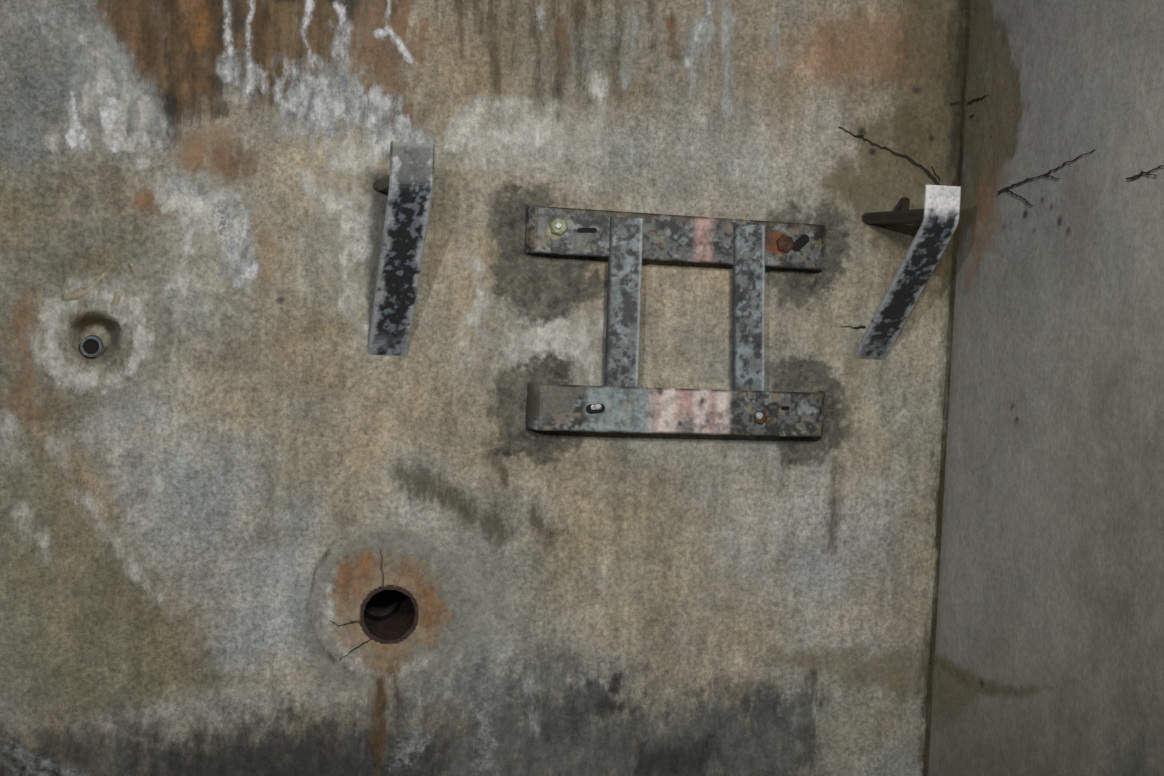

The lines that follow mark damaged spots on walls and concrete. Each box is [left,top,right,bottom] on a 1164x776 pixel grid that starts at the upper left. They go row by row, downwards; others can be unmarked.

leakage [217,0,569,176]
leakage [589,71,607,159]
crack [839,0,990,187]
crack [997,149,1096,206]
leakage [299,170,377,315]
leakage [466,258,490,332]
leakage [506,307,606,381]
crack [950,226,958,330]
crack [923,361,951,776]
leakage [0,648,812,776]